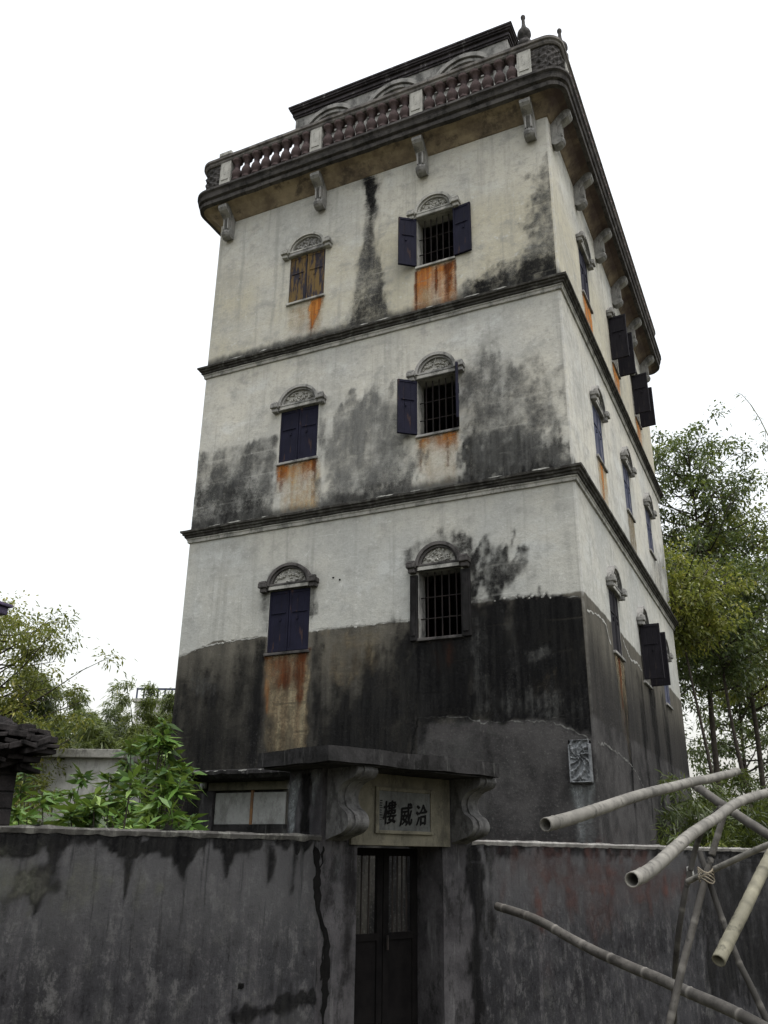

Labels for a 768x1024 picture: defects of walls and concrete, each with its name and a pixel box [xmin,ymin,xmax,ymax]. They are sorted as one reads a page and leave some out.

rust [299,297,321,328]
water stain [341,176,388,326]
rust [415,260,456,310]
water stain [463,171,556,296]
water stain [191,435,277,529]
rust [277,459,319,506]
water stain [315,386,426,507]
water stain [457,355,571,483]
rust [264,649,310,750]
water stain [312,533,591,754]
water stain [0,773,313,914]
crack [313,844,331,1024]